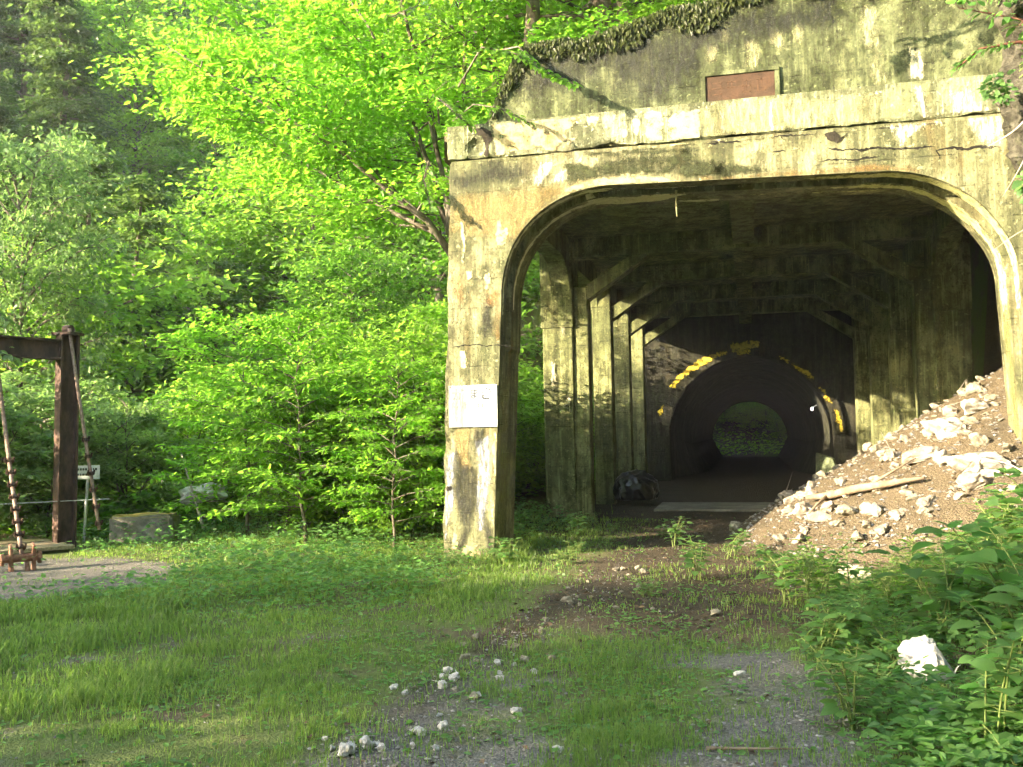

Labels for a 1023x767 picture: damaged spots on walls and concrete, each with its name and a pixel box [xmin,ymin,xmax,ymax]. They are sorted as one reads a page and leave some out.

damp [517,1,834,105]
damp [862,8,879,47]
damp [909,49,925,117]
peeling [473,116,599,156]
peeling [609,94,877,154]
crack [771,123,999,162]
peeling [804,173,1021,312]
damp [455,452,482,549]